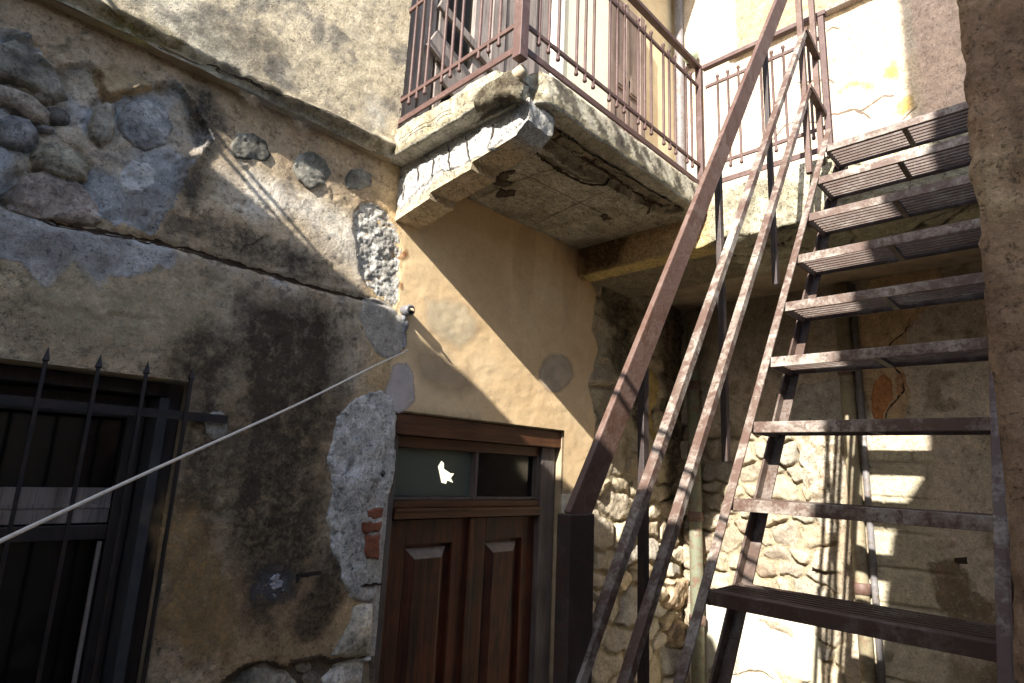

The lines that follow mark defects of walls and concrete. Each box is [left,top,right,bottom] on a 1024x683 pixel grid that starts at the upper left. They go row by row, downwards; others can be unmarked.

spalling [0,28,215,289]
spalling [292,70,523,307]
crack [478,135,677,224]
crack [757,95,917,148]
crack [37,219,364,301]
crack [885,318,910,419]
damp [42,272,343,623]
flaking render [361,507,384,560]
damp [295,553,344,641]